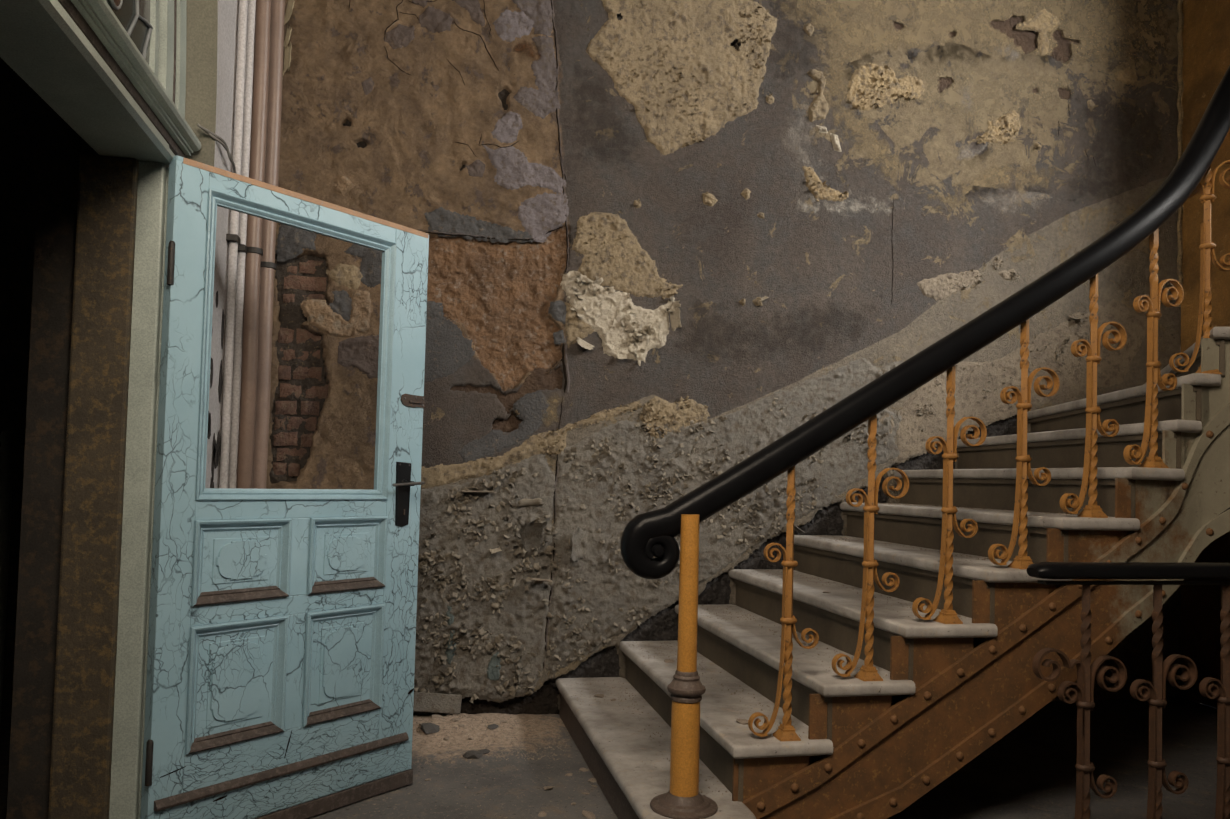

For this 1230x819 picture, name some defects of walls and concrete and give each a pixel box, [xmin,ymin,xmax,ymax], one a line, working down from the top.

peeling [283,0,295,75]
spalling [989,9,1079,64]
spalling [498,89,510,110]
peeling [586,0,778,155]
peeling [845,63,953,111]
peeling [968,110,1021,145]
peeling [917,255,1020,301]
flaking render [269,254,329,484]
peeling [408,212,904,715]